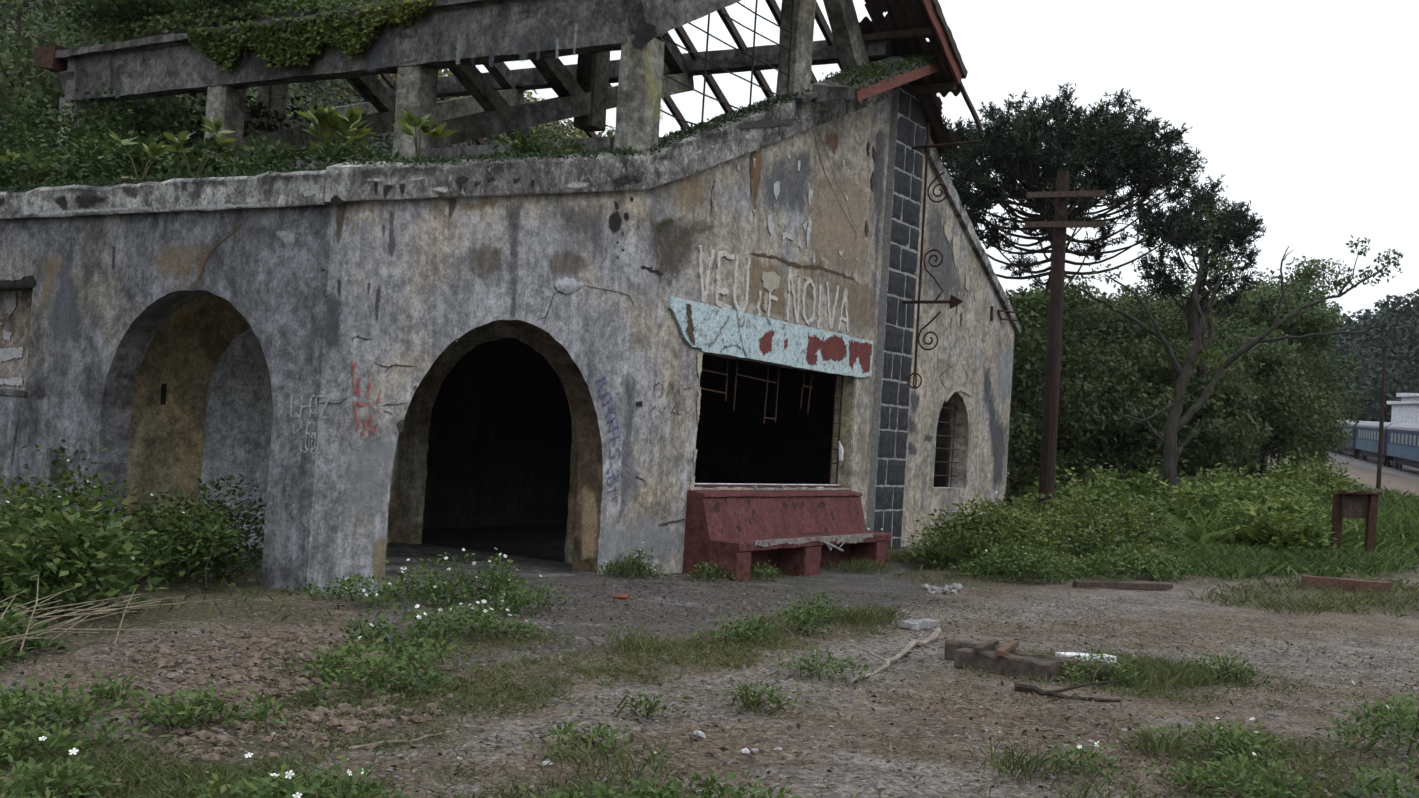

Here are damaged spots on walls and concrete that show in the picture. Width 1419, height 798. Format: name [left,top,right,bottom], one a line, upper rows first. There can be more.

leakage [765,153,811,209]
peeling [761,271,781,312]
leakage [984,347,1012,484]